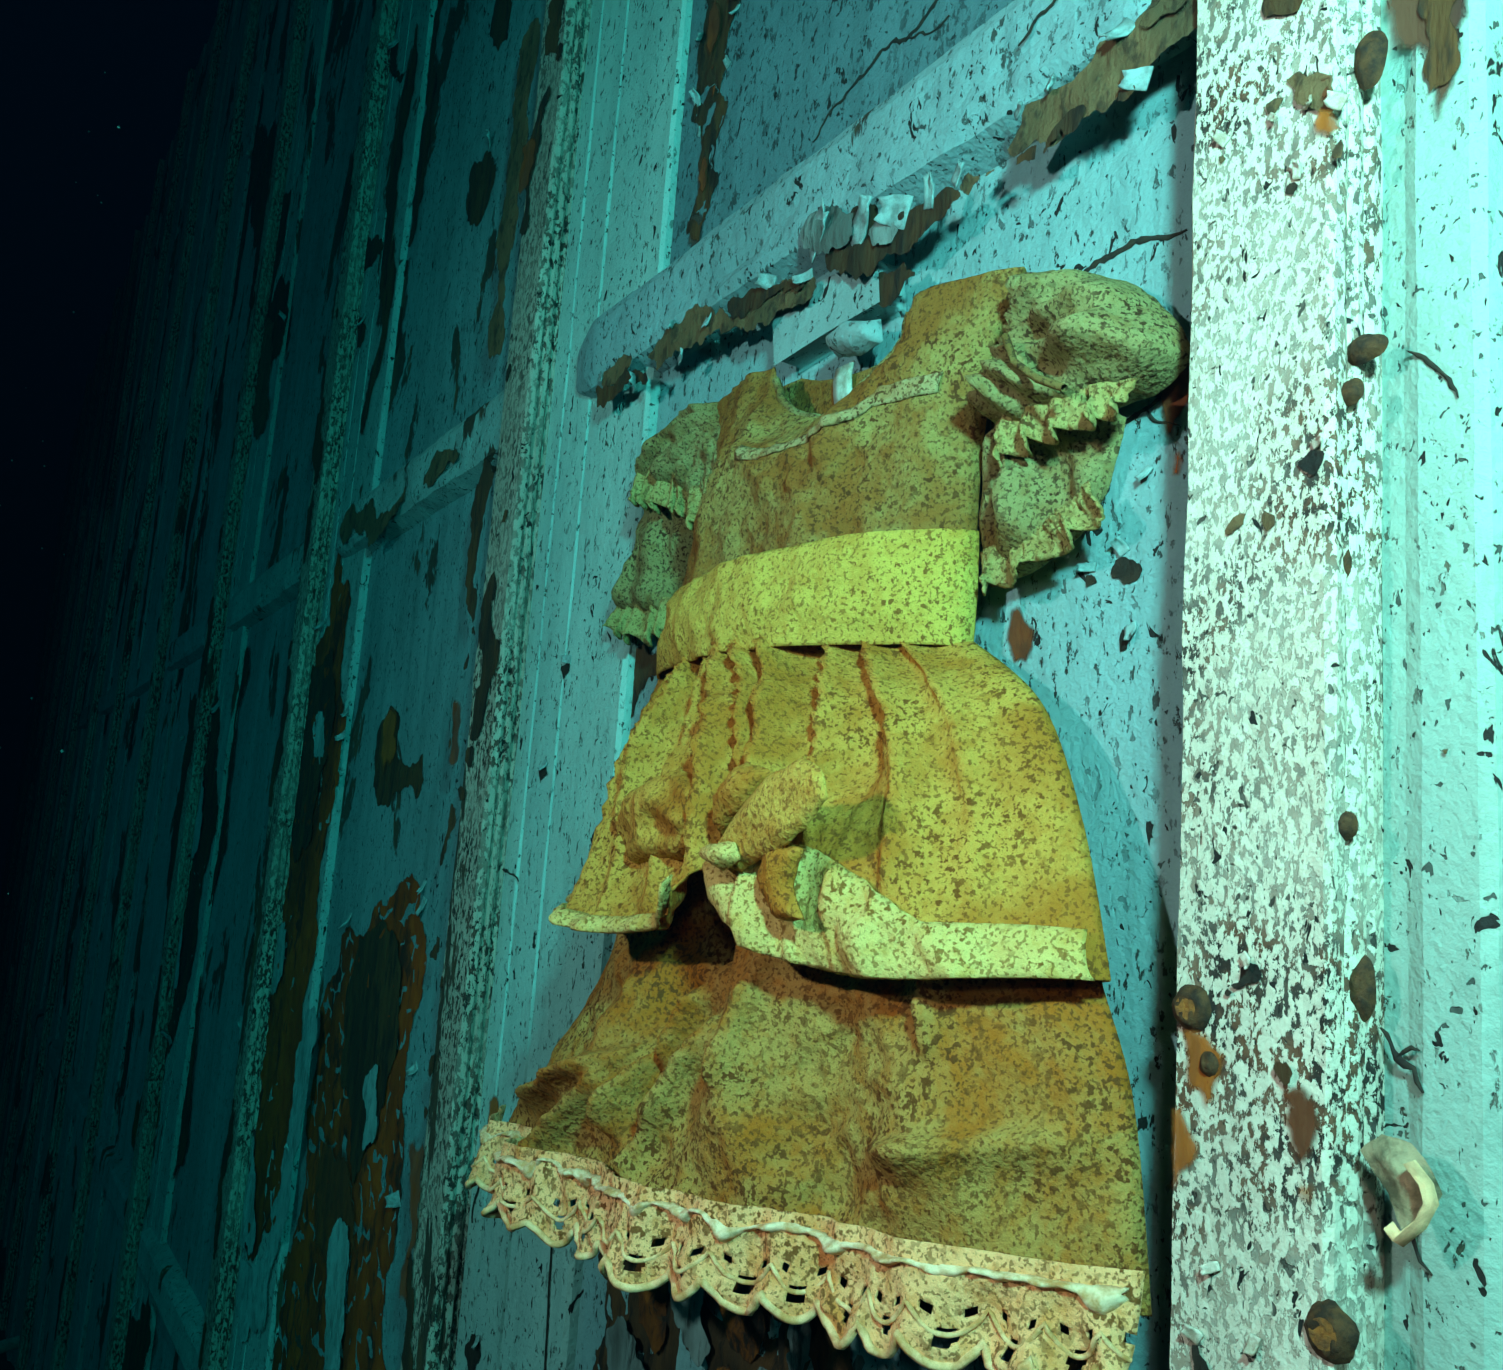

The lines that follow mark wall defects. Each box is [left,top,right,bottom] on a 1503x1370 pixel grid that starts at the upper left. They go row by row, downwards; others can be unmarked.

crack [812,0,950,143]
crack [1018,0,1056,46]
peeling [1008,0,1198,165]
peeling [354,0,444,435]
peeling [466,129,496,227]
peeling [596,159,994,408]
peeling [150,647,249,1179]
peeling [235,449,458,1370]
corrosion [1173,1108,1197,1180]
corrosion [1183,1030,1221,1102]
corrosion [1273,1062,1317,1160]
peeling [593,1232,865,1370]